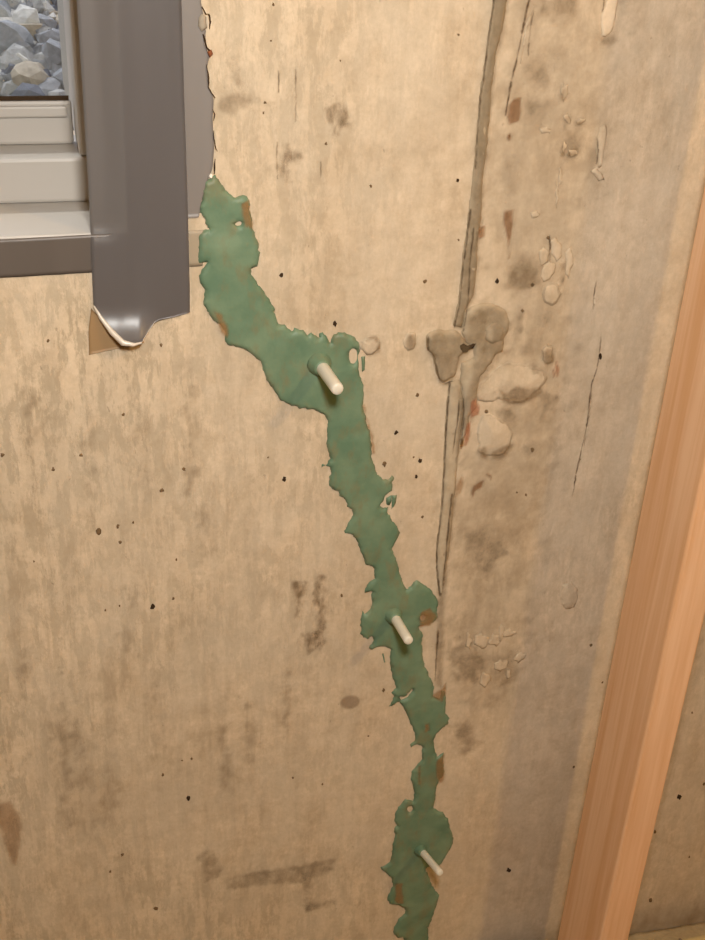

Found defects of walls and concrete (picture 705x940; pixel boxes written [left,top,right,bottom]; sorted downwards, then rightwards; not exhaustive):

peeling [601,0,618,37]
peeling [539,237,573,282]